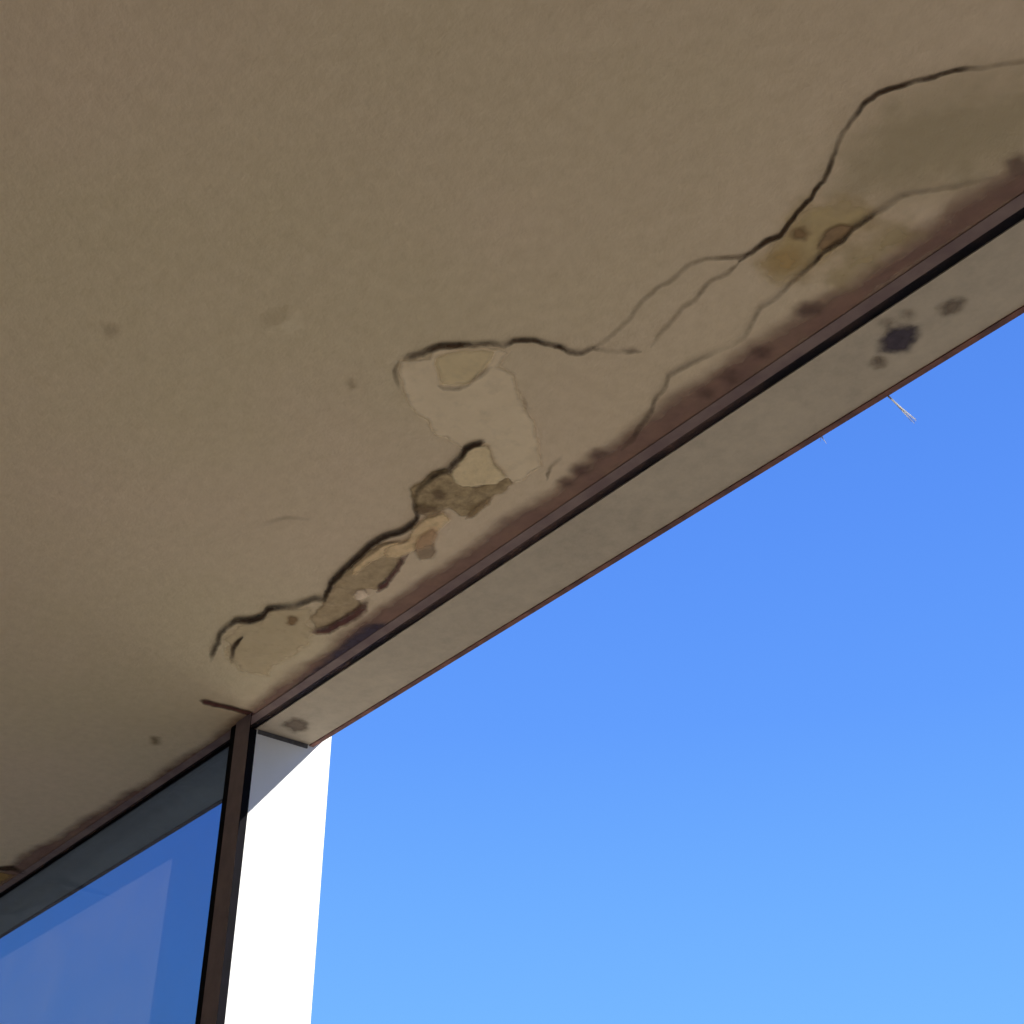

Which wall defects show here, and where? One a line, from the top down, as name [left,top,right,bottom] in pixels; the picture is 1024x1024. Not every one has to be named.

crack [847,68,967,127]
crack [724,153,836,260]
crack [801,213,877,276]
crack [409,339,590,359]
peeling [227,347,541,674]
crack [427,441,485,483]
leakage [216,159,1024,740]
crack [211,510,420,656]
leakage [0,749,202,886]